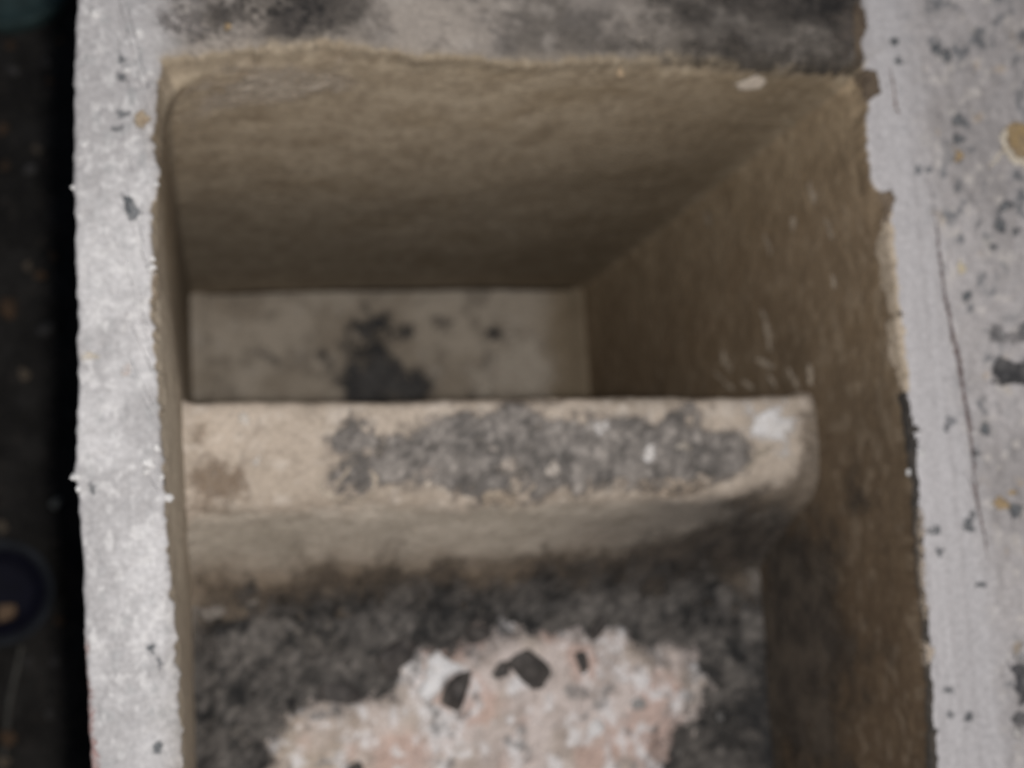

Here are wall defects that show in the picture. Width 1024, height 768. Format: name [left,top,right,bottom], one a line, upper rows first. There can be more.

spalling [324,401,753,507]